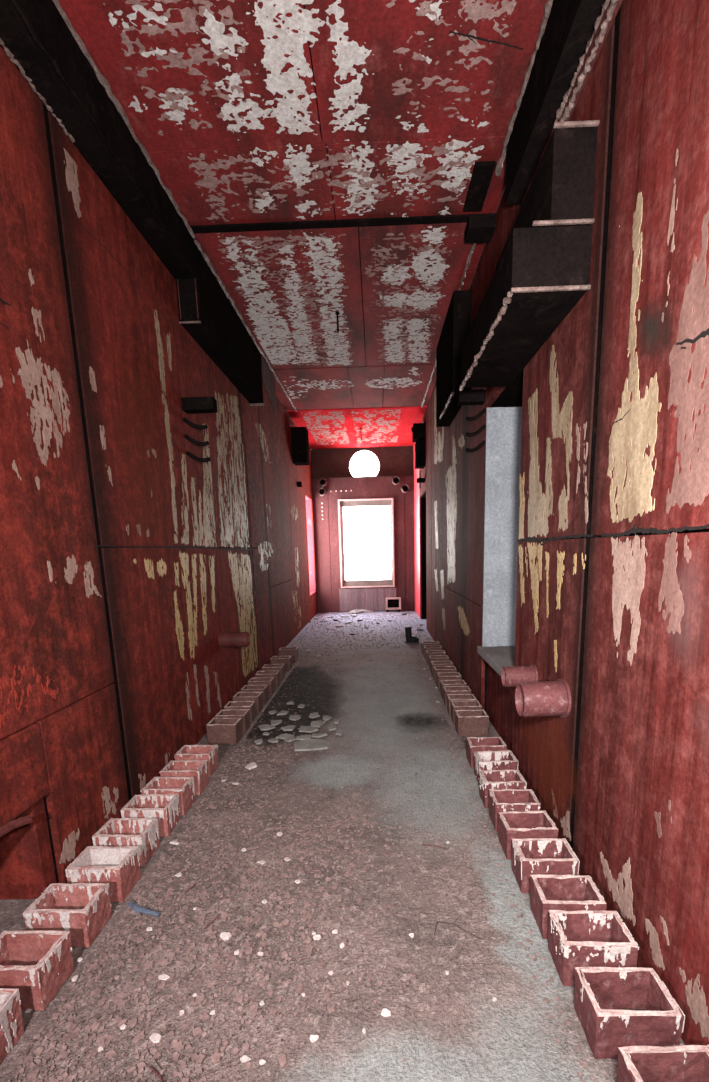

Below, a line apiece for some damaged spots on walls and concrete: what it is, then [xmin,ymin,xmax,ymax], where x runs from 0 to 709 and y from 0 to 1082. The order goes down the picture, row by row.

peeling [103,0,517,399]
peeling [0,307,70,490]
peeling [89,367,97,393]
peeling [133,309,273,720]
peeling [303,409,401,445]
peeling [434,388,465,629]
peeling [458,606,470,636]
peeling [518,345,588,633]
peeling [611,535,647,665]
peeling [607,192,709,523]
peeling [658,532,691,634]
peeling [600,852,669,971]